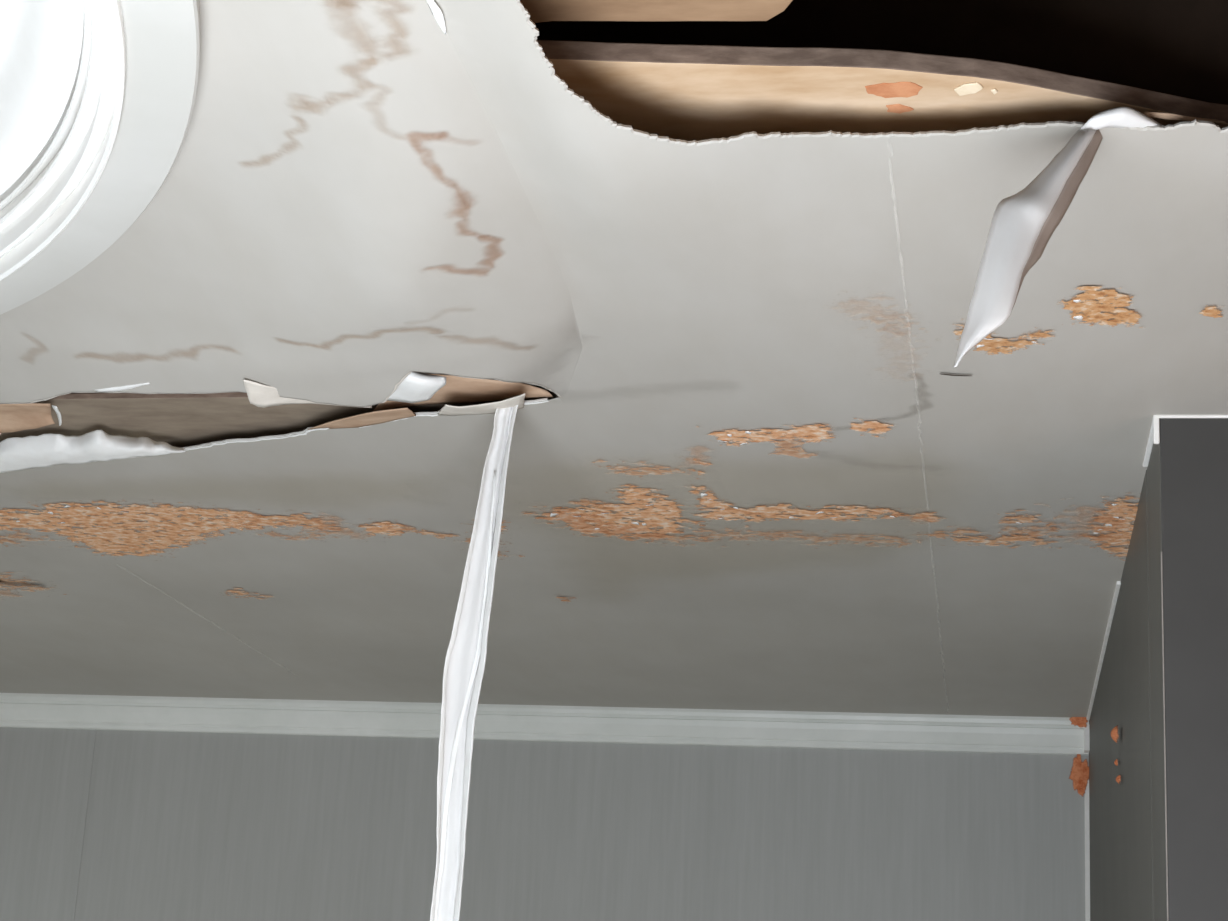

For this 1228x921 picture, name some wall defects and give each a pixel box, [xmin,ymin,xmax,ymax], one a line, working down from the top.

peeling [1059,286,1142,328]
peeling [973,330,1054,355]
peeling [696,424,836,458]
peeling [849,418,893,437]
peeling [524,459,1062,549]
peeling [0,501,473,561]
peeling [1078,496,1140,561]